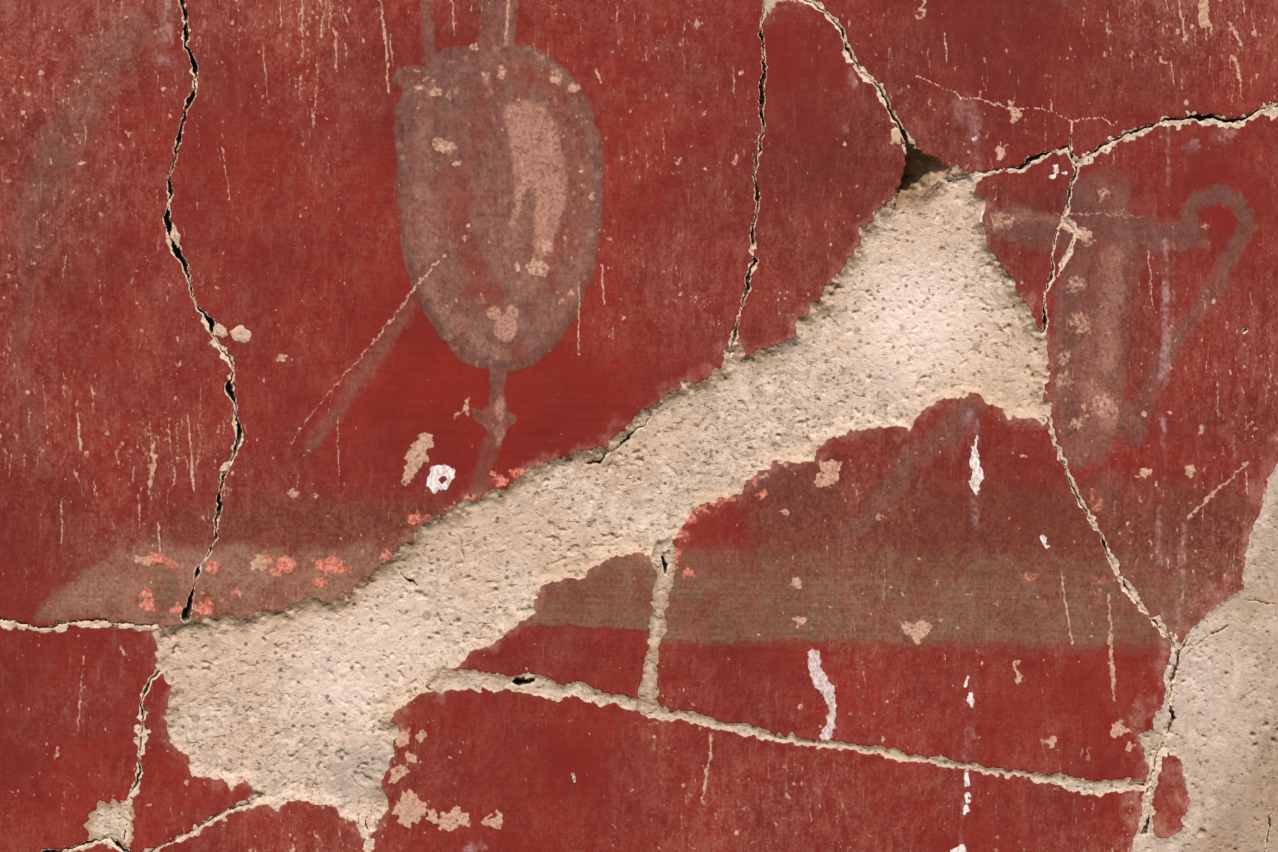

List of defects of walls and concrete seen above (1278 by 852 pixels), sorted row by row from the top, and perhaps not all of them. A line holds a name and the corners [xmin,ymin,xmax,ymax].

crack [0,0,251,633]
crack [728,4,768,360]
spalling [763,0,796,14]
crack [799,0,916,154]
crack [916,75,1278,336]
spalling [84,798,135,849]
crack [41,668,266,852]
spalling [129,164,1052,839]
peeling [1082,476,1107,521]
peeling [1077,561,1140,618]
crack [1045,414,1276,839]
spalling [1109,461,1278,852]